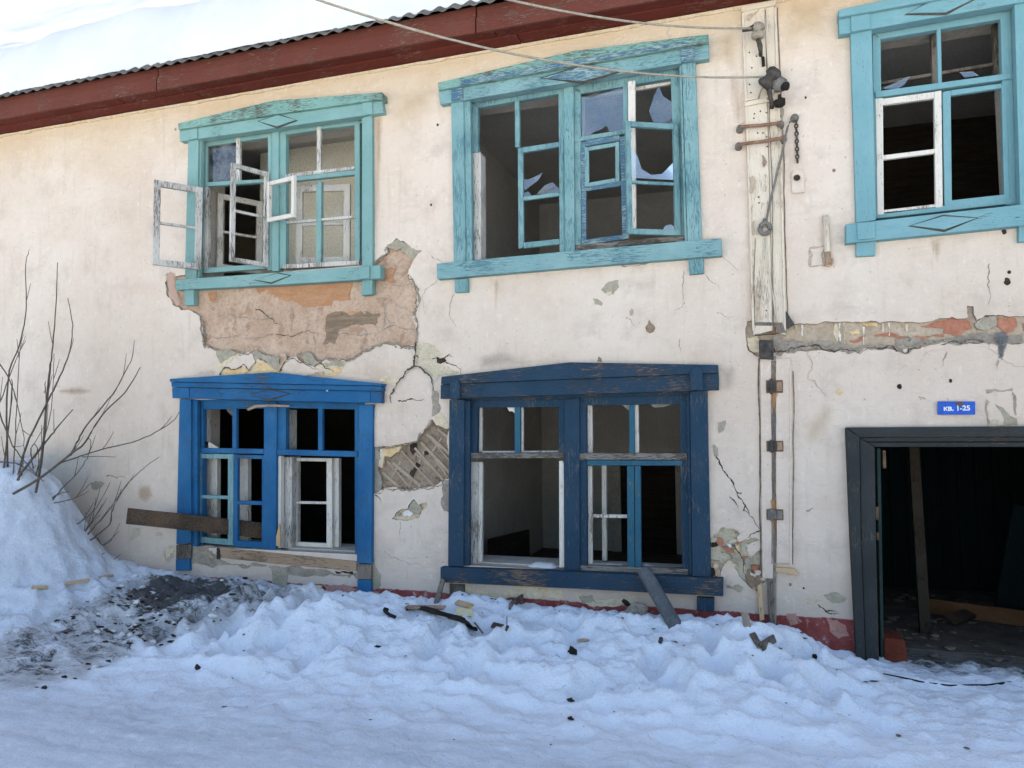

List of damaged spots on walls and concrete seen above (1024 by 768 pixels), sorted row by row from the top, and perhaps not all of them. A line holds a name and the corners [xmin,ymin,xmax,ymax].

peeling [808,245,825,268]
peeling [593,280,619,306]
spalling [745,307,1024,357]
spalling [167,239,459,520]
crack [389,343,461,402]
peeling [985,388,1019,426]
crack [716,456,760,538]
spalling [710,527,766,593]